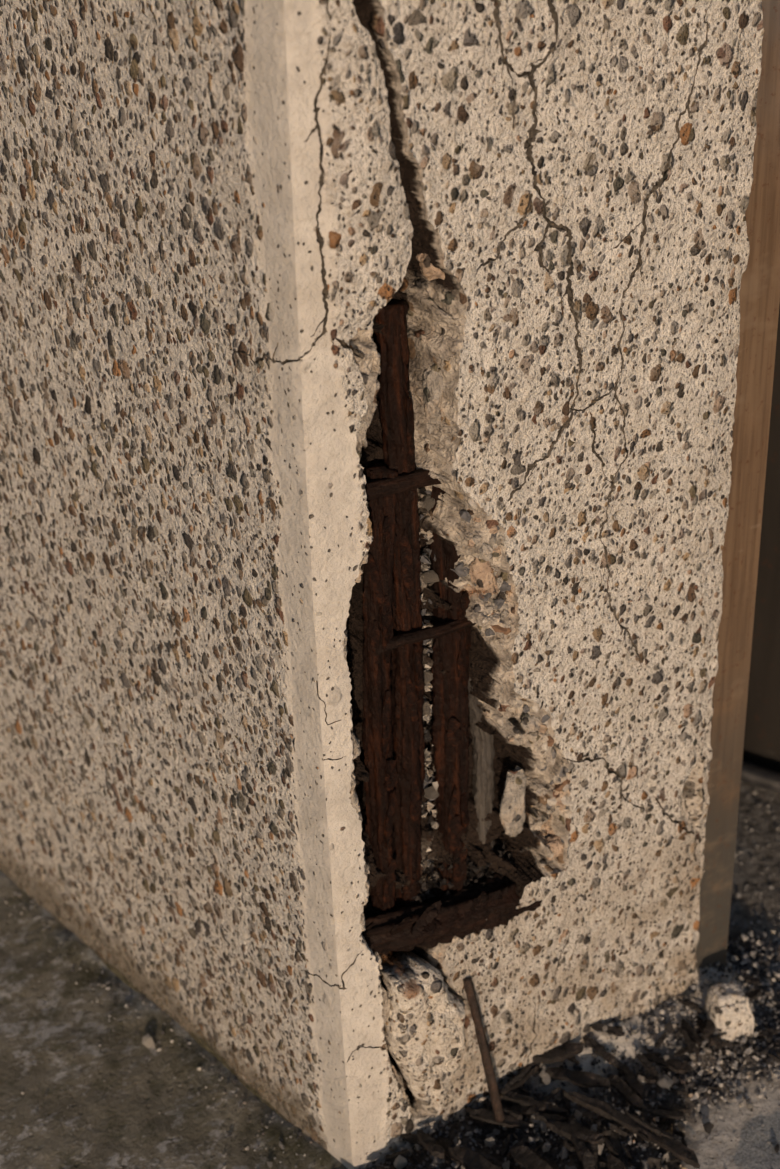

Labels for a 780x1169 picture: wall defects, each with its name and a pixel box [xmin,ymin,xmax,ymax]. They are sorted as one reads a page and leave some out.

crack [230,0,712,668]
spalling [342,253,572,1119]
crack [562,757,701,862]